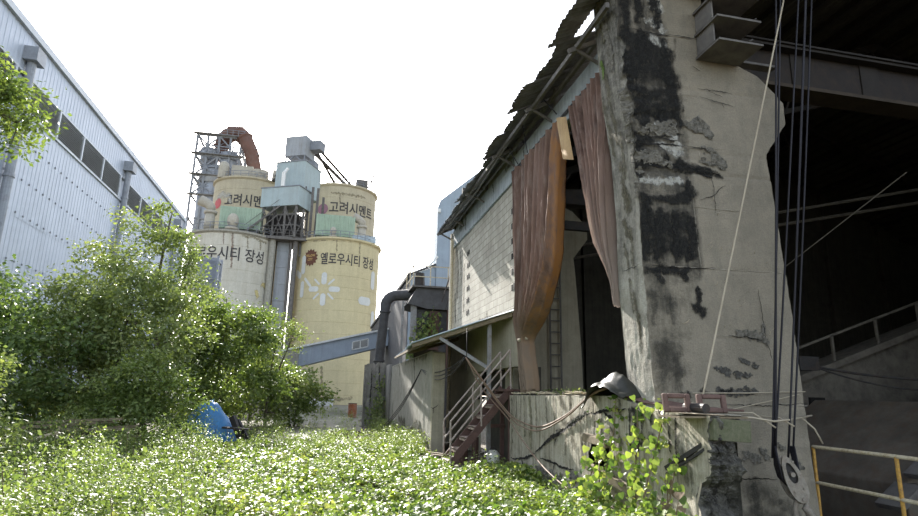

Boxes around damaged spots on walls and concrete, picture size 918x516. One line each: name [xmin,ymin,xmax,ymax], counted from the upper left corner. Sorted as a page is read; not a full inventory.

water stain [593,0,723,353]
spalling [617,86,728,198]